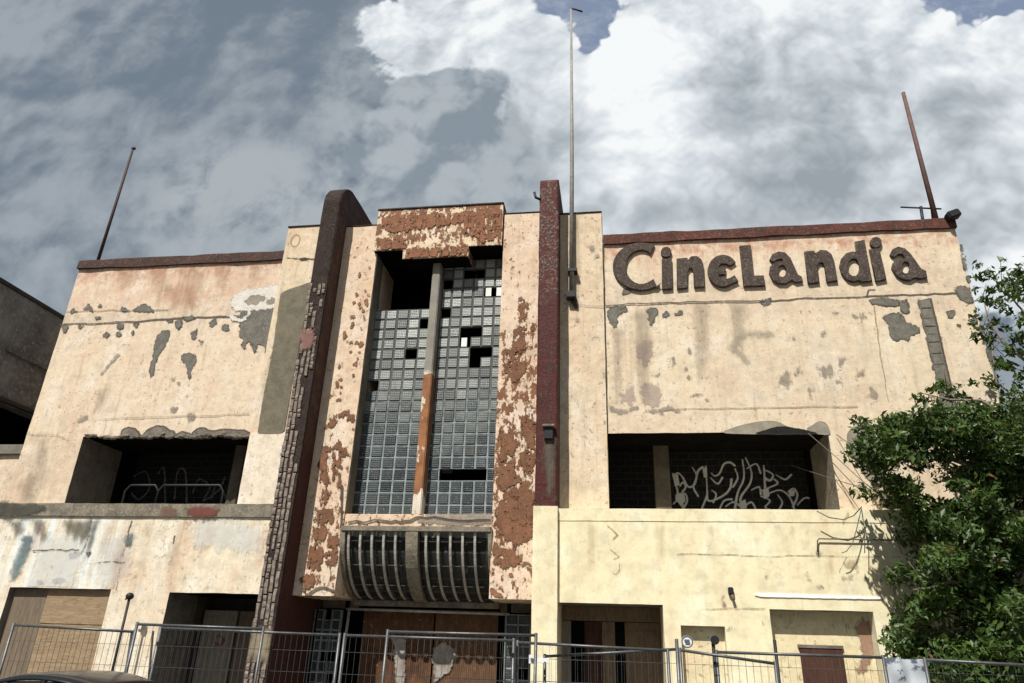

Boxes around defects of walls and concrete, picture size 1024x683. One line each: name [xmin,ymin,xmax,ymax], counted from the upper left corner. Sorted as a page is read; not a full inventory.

peeling [376,207,502,257]
peeling [60,303,102,333]
peeling [103,304,154,338]
peeling [149,315,204,385]
peeling [230,284,278,311]
peeling [328,290,370,428]
peeling [502,297,537,382]
spalling [852,244,994,408]
spalling [77,407,250,440]
water stain [12,520,44,579]
water stain [67,520,96,550]
peeling [299,439,351,598]